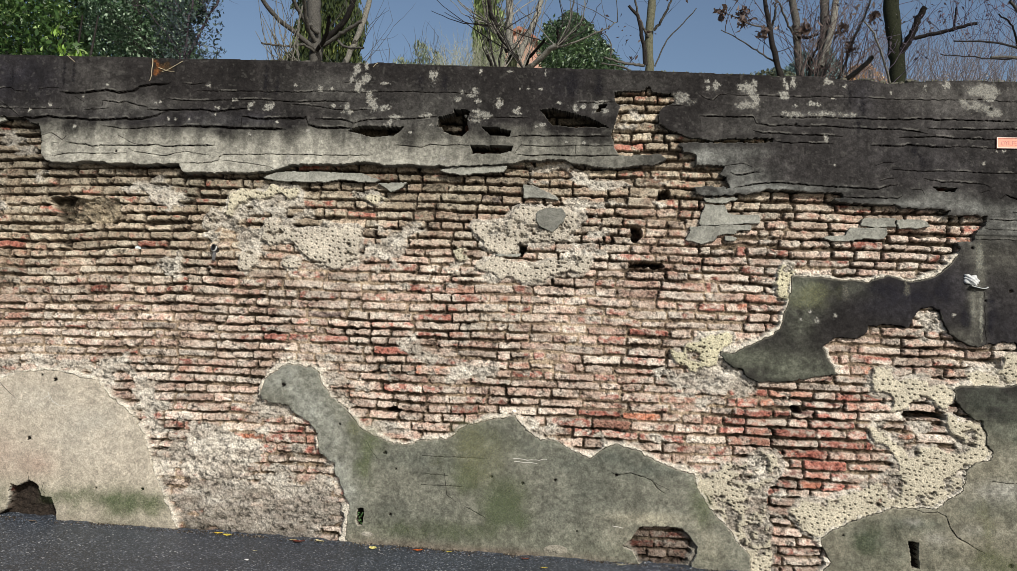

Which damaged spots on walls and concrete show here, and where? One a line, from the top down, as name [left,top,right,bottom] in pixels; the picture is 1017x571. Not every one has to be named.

crack [0,61,469,170]
crack [469,117,619,157]
crack [673,93,1017,241]
spalling [261,218,364,271]
spalling [449,254,592,283]
spalling [667,331,735,373]
spalling [871,366,955,414]
spalling [964,353,1017,387]
spalling [0,480,56,516]
spalling [695,450,782,571]
spalling [788,414,992,538]
crack [915,509,984,553]